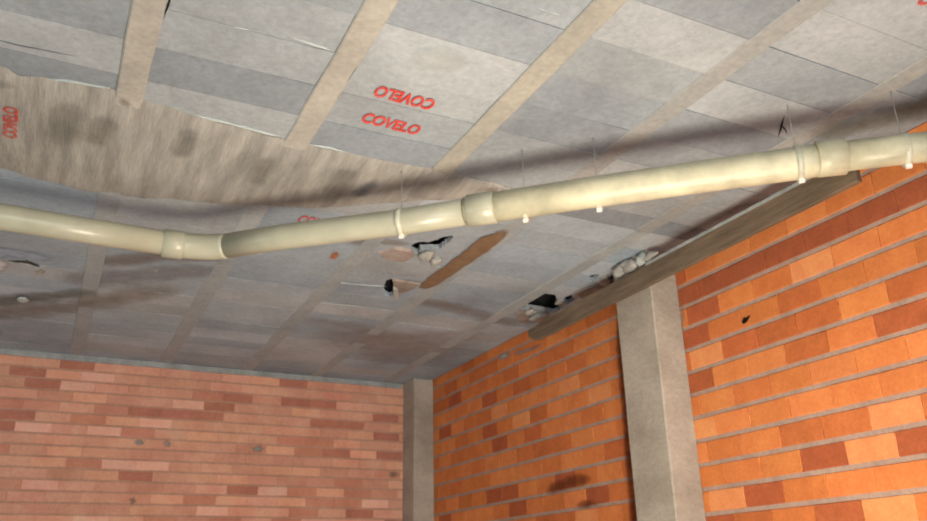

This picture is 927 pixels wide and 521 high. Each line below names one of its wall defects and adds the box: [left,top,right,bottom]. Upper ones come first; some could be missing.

spalling [377,236,450,266]
leakage [99,268,204,283]
spalling [384,279,421,299]
spalling [515,274,614,323]